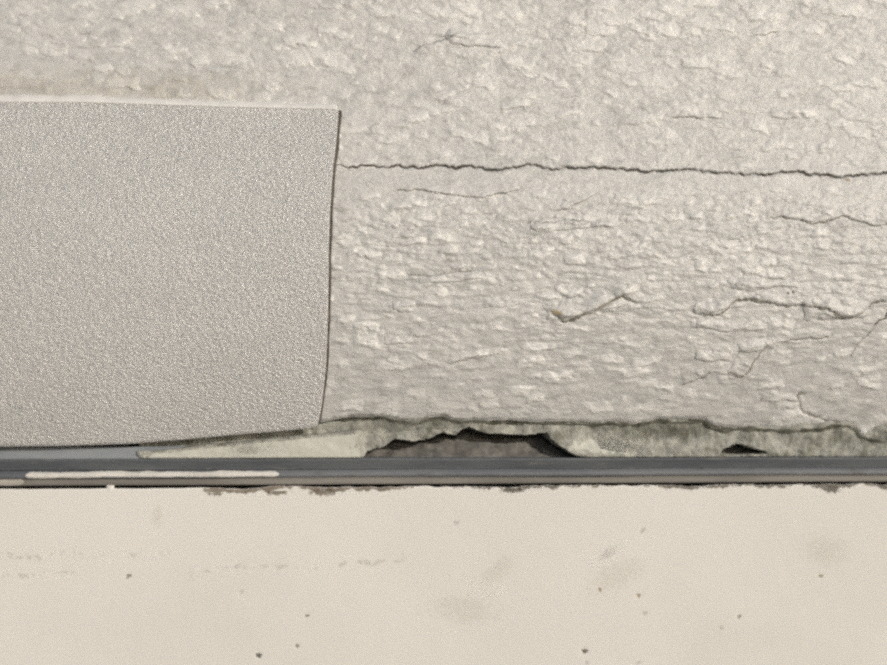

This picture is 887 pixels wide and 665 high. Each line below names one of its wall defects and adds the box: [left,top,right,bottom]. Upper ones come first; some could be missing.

crack [318,110,887,443]
spalling [364,427,577,457]
hole [721,444,758,454]